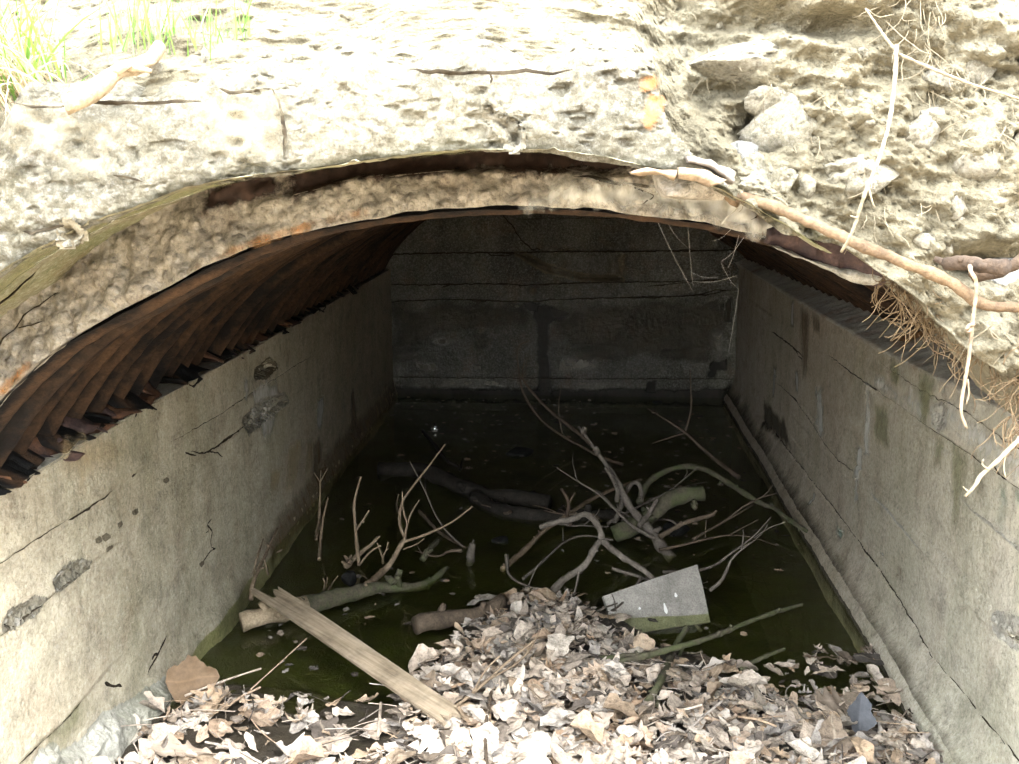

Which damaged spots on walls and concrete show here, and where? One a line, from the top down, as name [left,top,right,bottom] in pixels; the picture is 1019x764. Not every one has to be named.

crack [23,224,64,235]
rust [890,330,937,343]
rust [0,284,357,496]
crack [831,357,1019,487]
crack [0,491,112,564]
crack [1,573,78,636]
crack [772,429,1019,761]
crack [105,680,122,688]
crack [148,636,167,673]
crack [20,703,80,763]